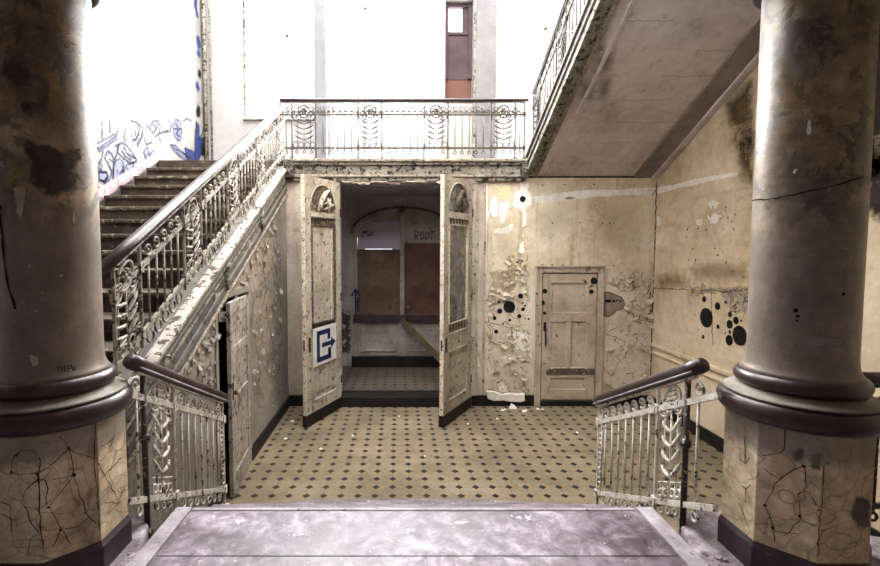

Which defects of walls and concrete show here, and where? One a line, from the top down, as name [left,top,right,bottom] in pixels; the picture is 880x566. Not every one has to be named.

damp [24,141,82,197]
damp [727,83,754,181]
crack [752,176,863,201]
peeling [187,309,226,387]
flaking render [235,198,284,414]
flaking render [475,253,532,394]
flaking render [603,270,655,393]
crack [3,424,124,556]
crack [740,427,829,556]